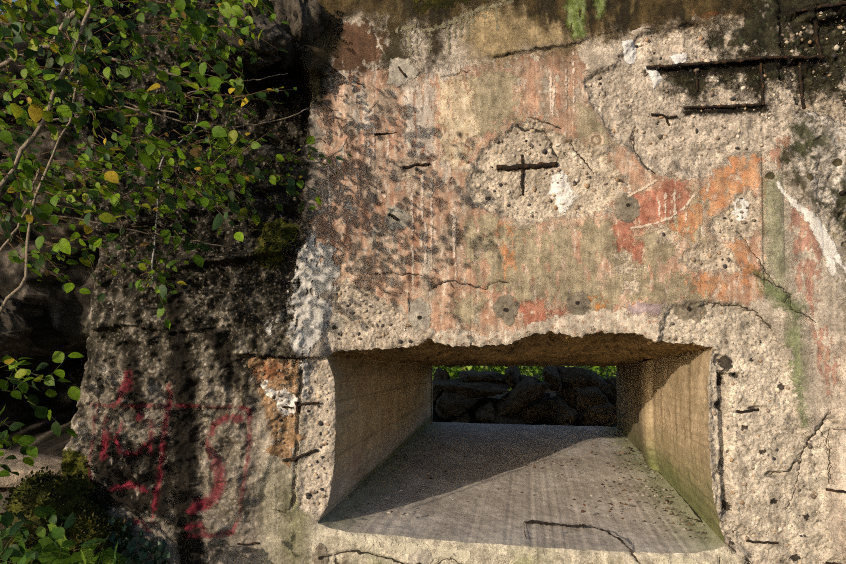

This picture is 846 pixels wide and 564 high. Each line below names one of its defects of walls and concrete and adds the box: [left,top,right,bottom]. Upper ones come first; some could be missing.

water stain [298,0,846,116]
rust [646,18,825,109]
rust [496,154,558,196]
water stain [549,171,579,215]
water stain [776,116,846,282]
efflorescence [260,231,340,416]
crack [376,272,508,308]
peeling [247,10,846,564]
water stain [90,265,205,564]
crack [770,413,846,509]
crack [325,550,408,564]
crack [524,519,640,564]